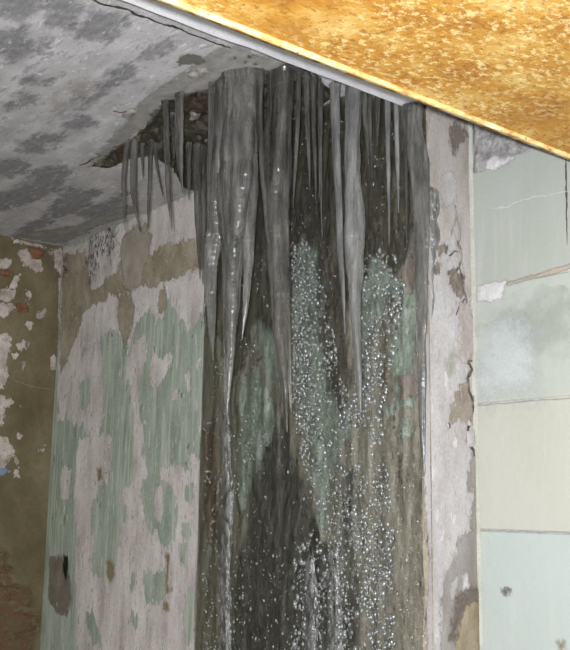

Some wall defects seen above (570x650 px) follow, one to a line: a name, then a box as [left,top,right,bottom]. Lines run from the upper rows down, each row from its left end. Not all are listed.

crack [93,0,231,48]
leakage [88,46,307,168]
spalling [255,69,330,133]
leakage [205,103,351,412]
leakage [356,97,426,278]
crack [449,205,468,315]
flaking render [428,110,535,367]
peeling [0,90,221,650]
flaking render [447,382,474,429]
crack [464,360,570,431]
leakage [232,415,361,650]
spalling [455,601,480,650]